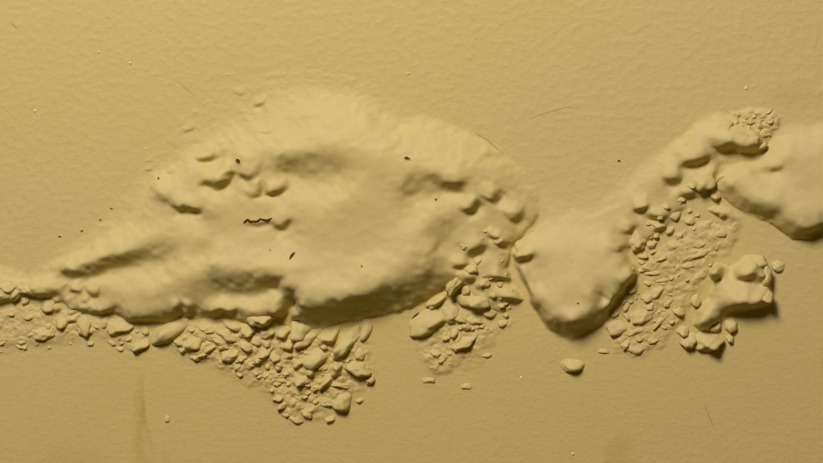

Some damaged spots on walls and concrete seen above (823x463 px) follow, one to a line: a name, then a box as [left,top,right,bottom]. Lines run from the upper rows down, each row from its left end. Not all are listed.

peeling [0,295,381,426]
peeling [408,291,515,383]
peeling [598,187,744,362]